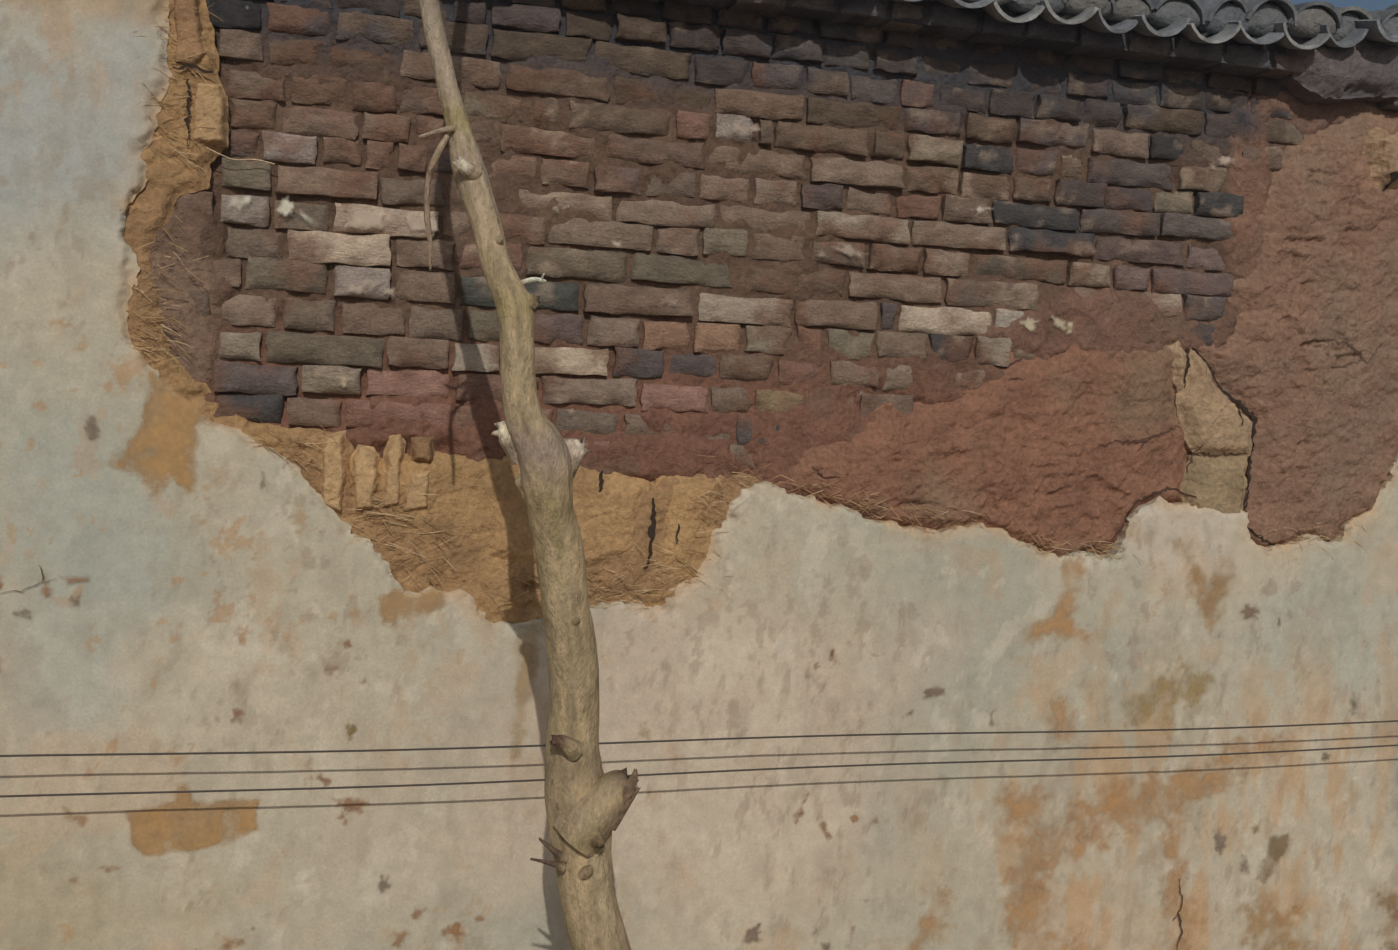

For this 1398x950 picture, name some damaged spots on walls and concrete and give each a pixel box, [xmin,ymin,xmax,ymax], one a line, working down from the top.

flaking render [120,0,543,624]
crack [644,498,680,569]
flaking render [439,0,1398,614]
crack [1099,348,1283,546]